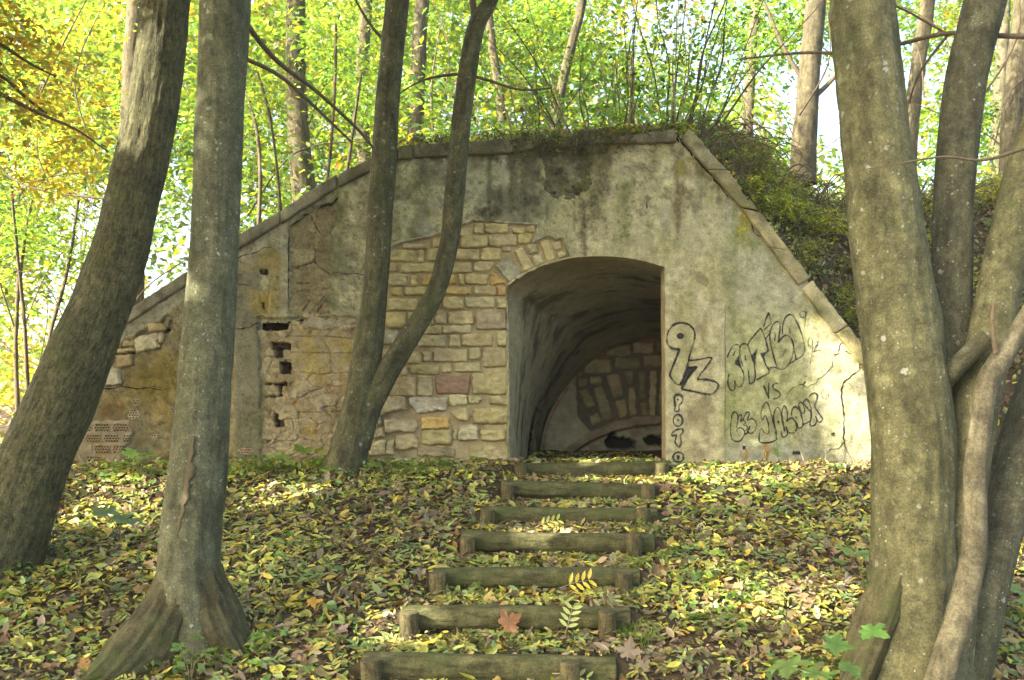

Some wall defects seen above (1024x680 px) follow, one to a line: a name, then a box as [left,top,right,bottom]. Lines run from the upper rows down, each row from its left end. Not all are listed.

spalling [73,399,141,466]
spalling [104,317,173,391]
spalling [238,303,358,464]
flaking render [369,219,578,465]
crack [787,343,861,459]